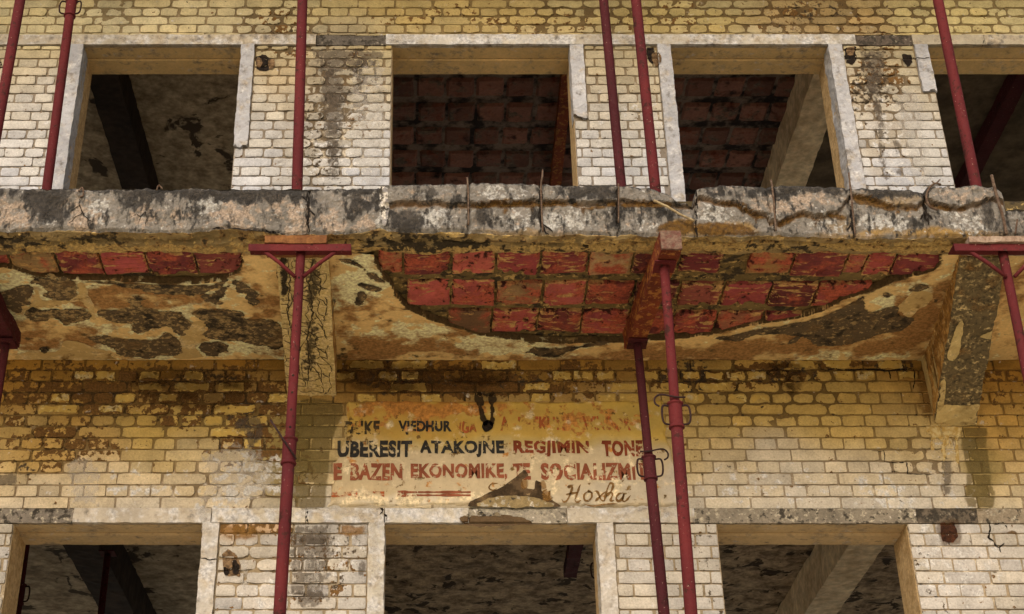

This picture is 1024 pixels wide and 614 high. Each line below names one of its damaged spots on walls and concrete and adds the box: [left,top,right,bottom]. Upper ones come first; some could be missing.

leakage [28,190,75,225]
leakage [114,189,162,222]
leakage [182,188,282,207]
spalling [653,199,695,222]
crack [692,191,700,236]
crack [847,189,856,238]
crack [920,192,933,225]
spalling [339,250,652,358]
spalling [648,251,943,346]
spalling [0,251,284,414]
peeling [268,393,287,402]
peeling [205,405,268,448]